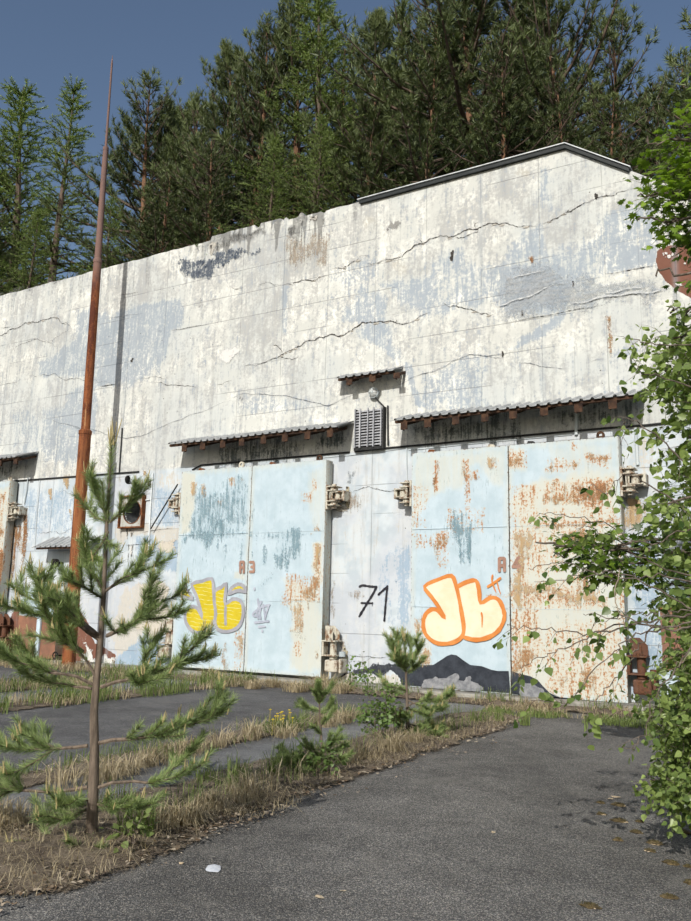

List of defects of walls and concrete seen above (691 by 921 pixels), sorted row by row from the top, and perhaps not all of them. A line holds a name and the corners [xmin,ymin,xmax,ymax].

peeling [178,242,261,280]
damp [286,223,327,267]
crack [242,189,629,288]
crack [0,317,70,345]
crack [256,314,424,366]
corrosion [543,482,608,506]
corrosion [0,515,27,583]
corrosion [290,543,320,631]
corrosion [509,526,605,608]